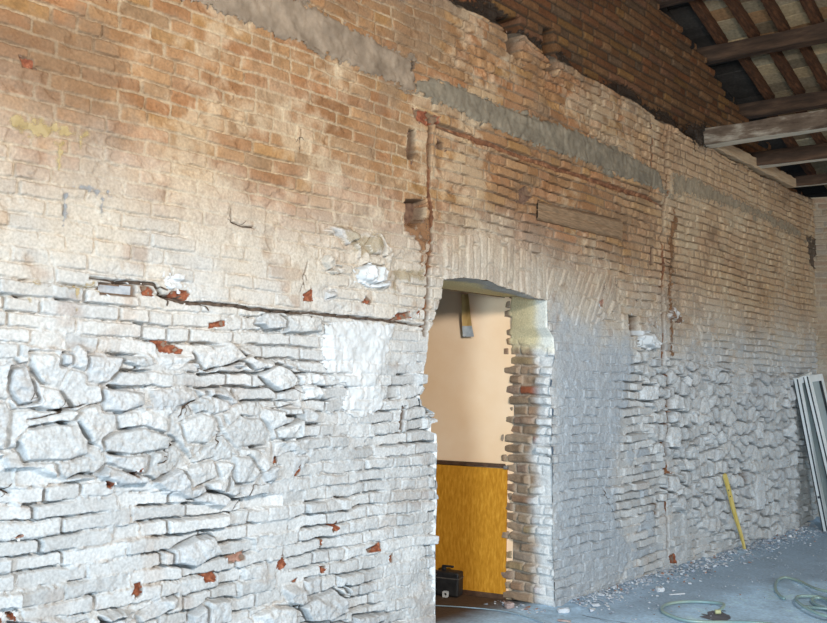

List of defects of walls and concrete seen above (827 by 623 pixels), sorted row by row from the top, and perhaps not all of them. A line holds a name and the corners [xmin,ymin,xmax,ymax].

crack [89,278,417,326]
rust [659,209,678,356]
crack [27,393,84,420]